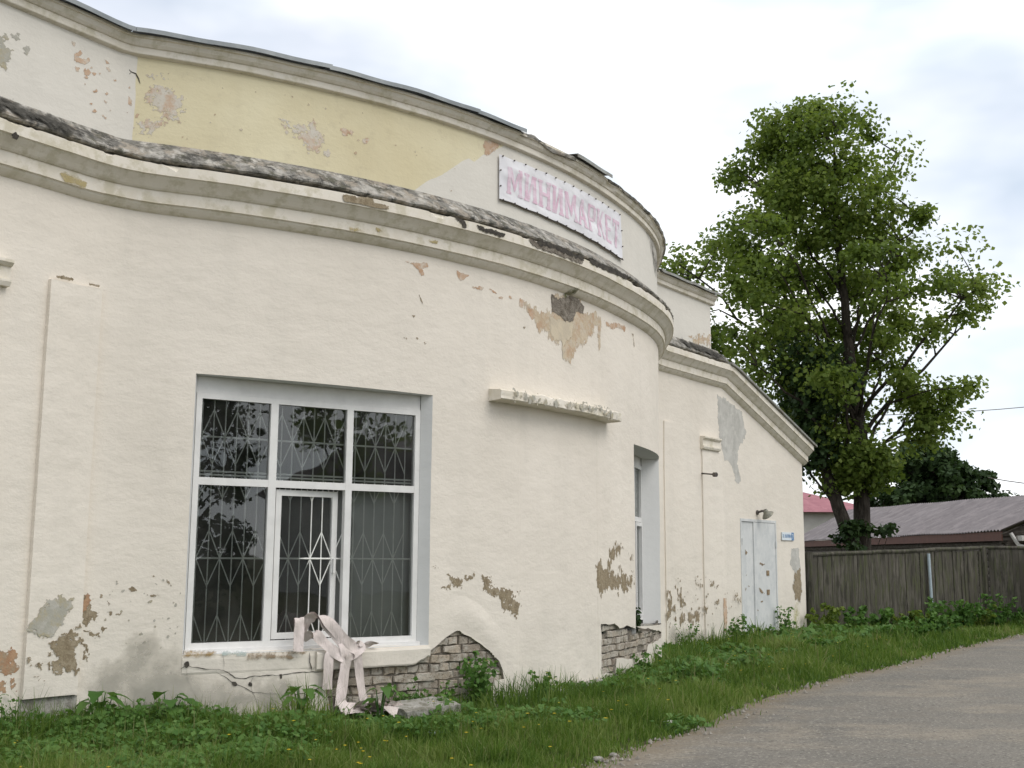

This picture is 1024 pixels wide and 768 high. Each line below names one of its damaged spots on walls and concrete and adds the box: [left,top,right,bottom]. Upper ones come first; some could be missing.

peeling [0,33,30,70]
leakage [0,96,82,135]
peeling [72,42,116,119]
peeling [127,73,186,138]
peeling [457,271,626,364]
flaking render [0,576,181,693]
peeling [442,573,520,619]
peeling [595,543,635,598]
flaking render [601,575,765,674]
flaking render [790,548,802,602]
crack [181,653,318,705]
flaking render [327,631,504,710]